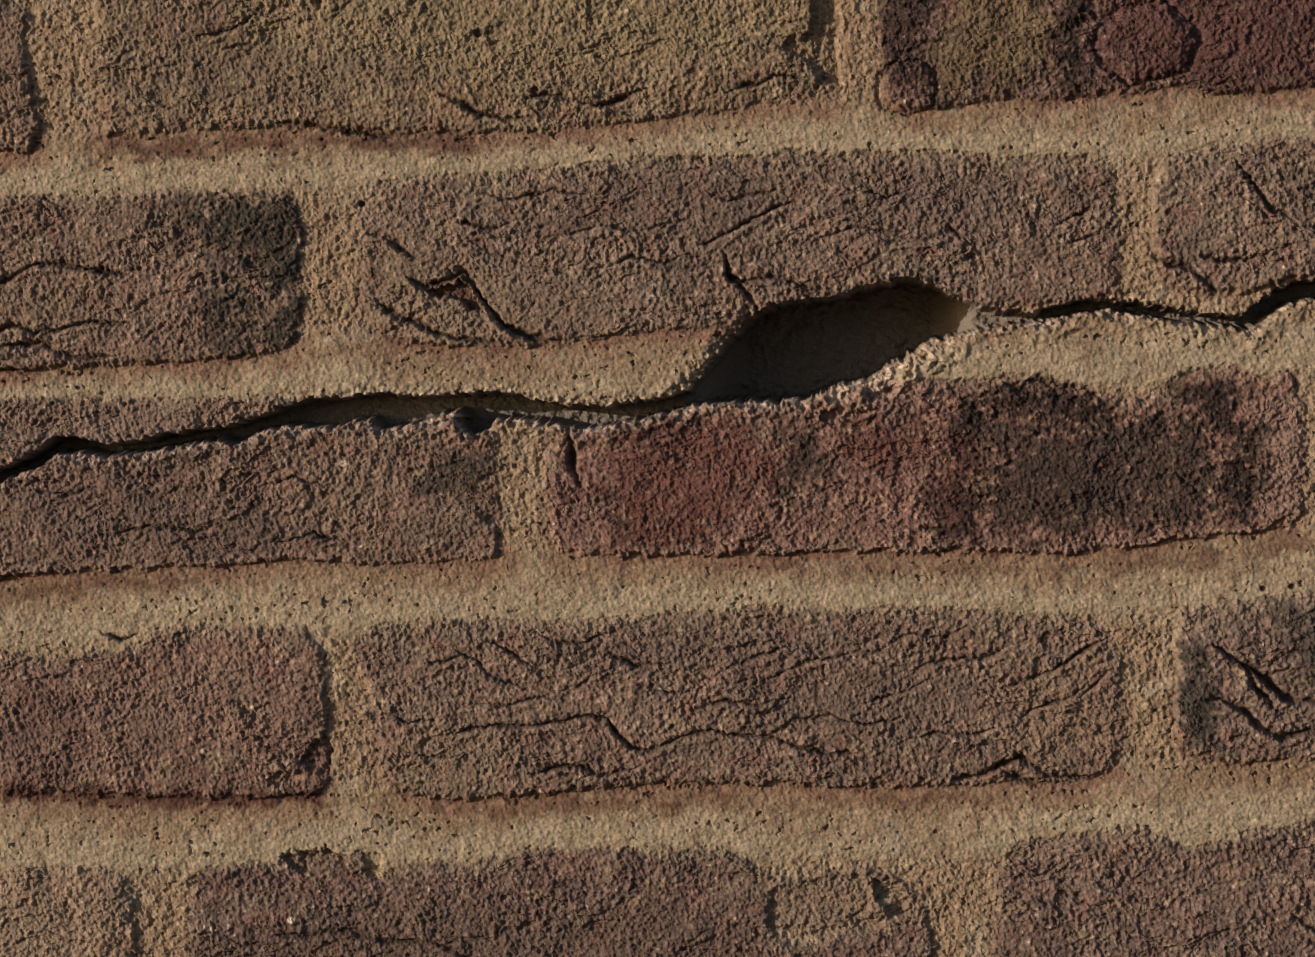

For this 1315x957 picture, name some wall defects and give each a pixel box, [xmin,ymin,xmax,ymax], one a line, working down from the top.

crack [1235,160,1297,222]
crack [0,187,1315,496]
crack [113,523,231,535]
crack [275,531,347,544]